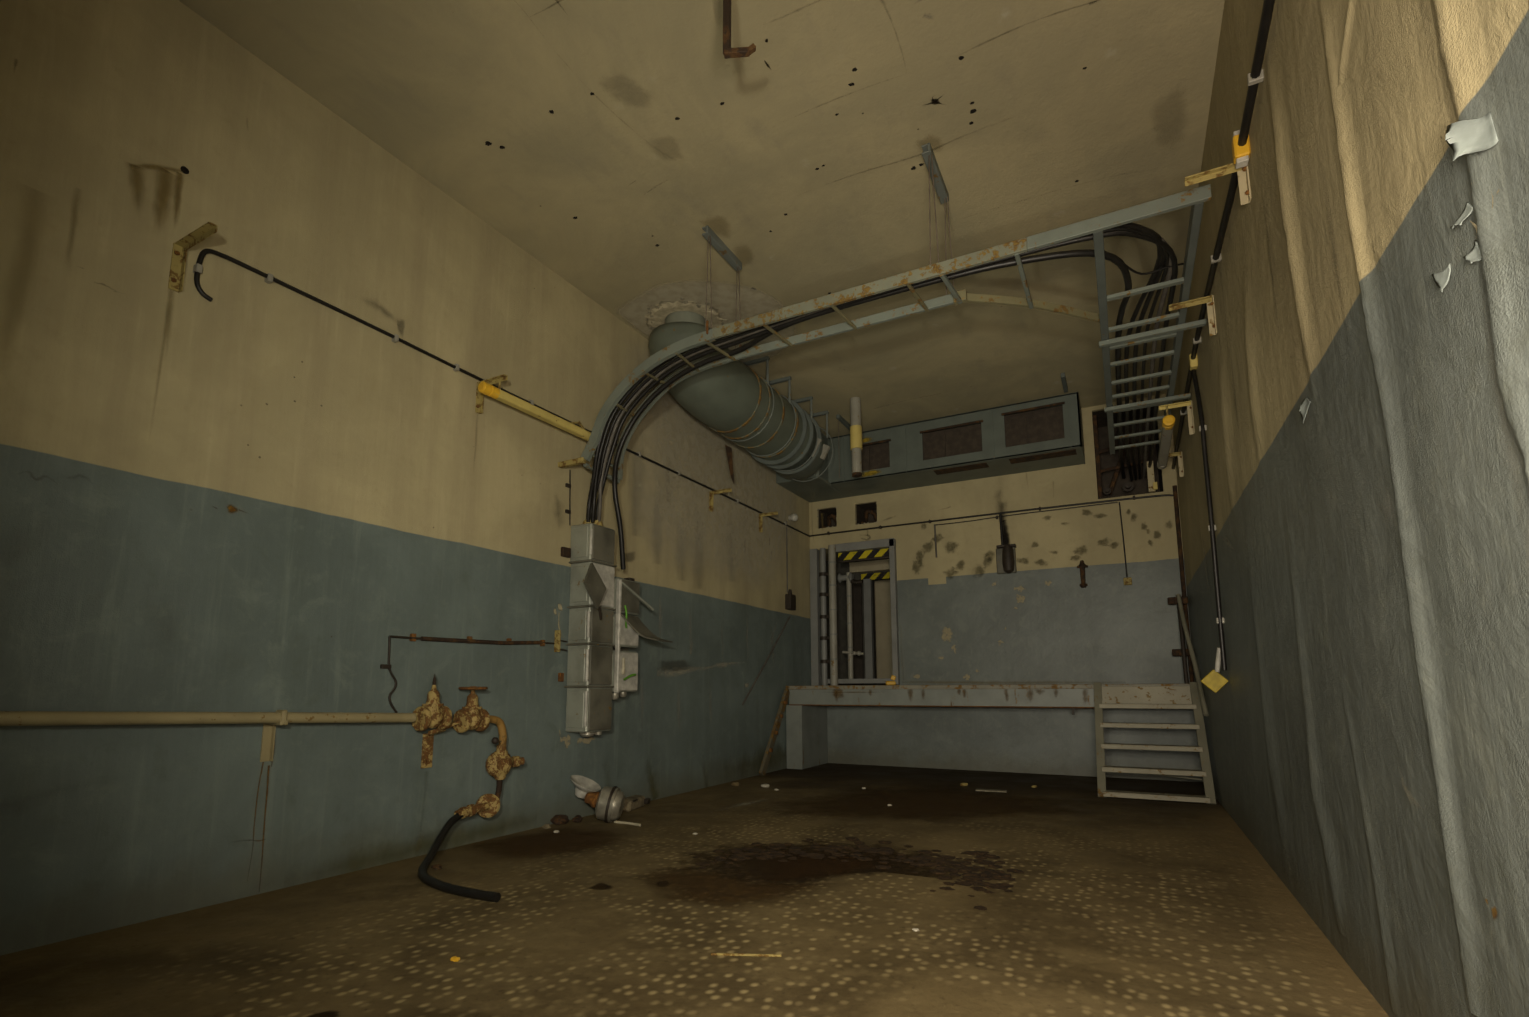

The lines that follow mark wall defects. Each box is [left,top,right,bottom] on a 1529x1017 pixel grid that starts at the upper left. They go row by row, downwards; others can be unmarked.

peeling [1445,112,1498,161]
peeling [1431,202,1482,292]
leakage [650,841,953,903]